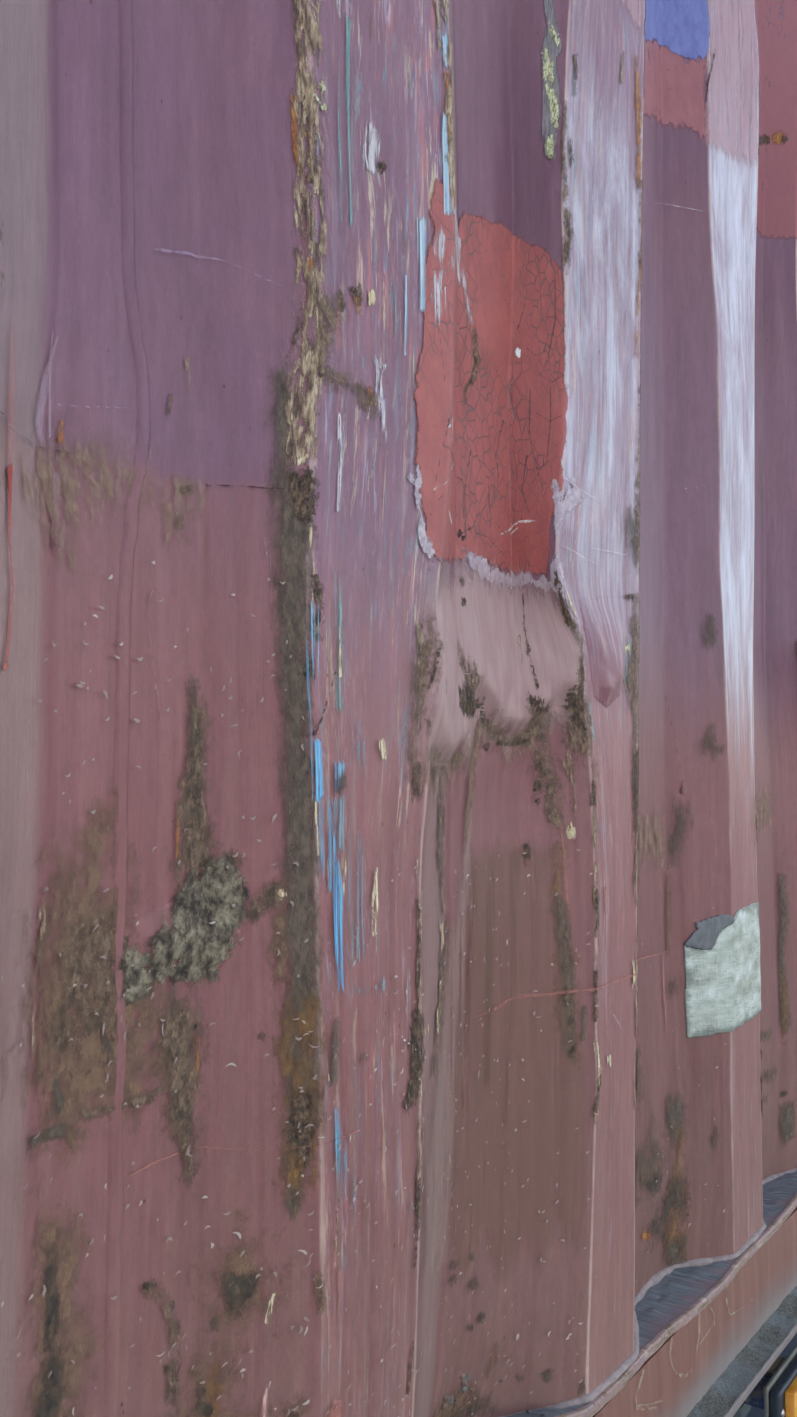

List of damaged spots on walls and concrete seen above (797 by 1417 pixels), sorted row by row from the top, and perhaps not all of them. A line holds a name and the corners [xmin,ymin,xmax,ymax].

corrosion [285,0,377,466]
peeling [434,227,446,320]
crack [434,206,564,547]
peeling [407,463,442,562]
peeling [458,527,569,605]
peeling [551,476,584,536]
corrosion [26,811,204,1183]
corrosion [244,879,288,978]
corrosion [404,570,611,1268]
corrosion [31,1218,95,1417]
corrosion [143,1278,237,1417]
corrosion [211,1246,271,1330]